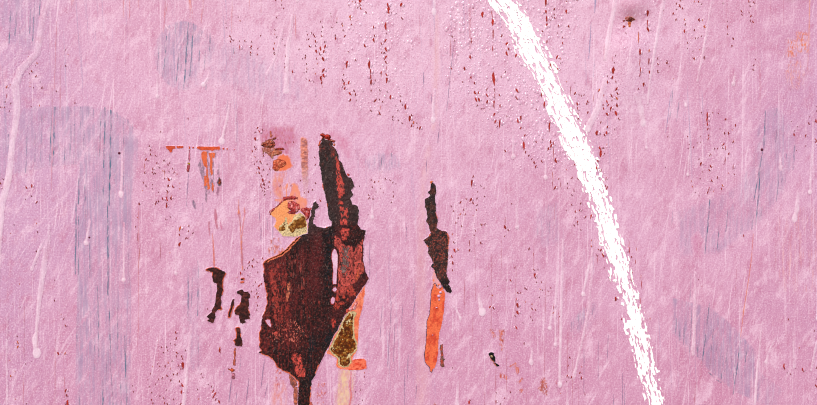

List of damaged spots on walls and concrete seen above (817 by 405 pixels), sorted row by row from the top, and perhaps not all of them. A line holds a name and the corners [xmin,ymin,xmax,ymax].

rust [260,121,303,199]
peeling [205,127,371,405]
rust [413,142,438,405]
peeling [284,0,594,235]
peeling [423,175,535,405]
peeling [487,247,588,402]